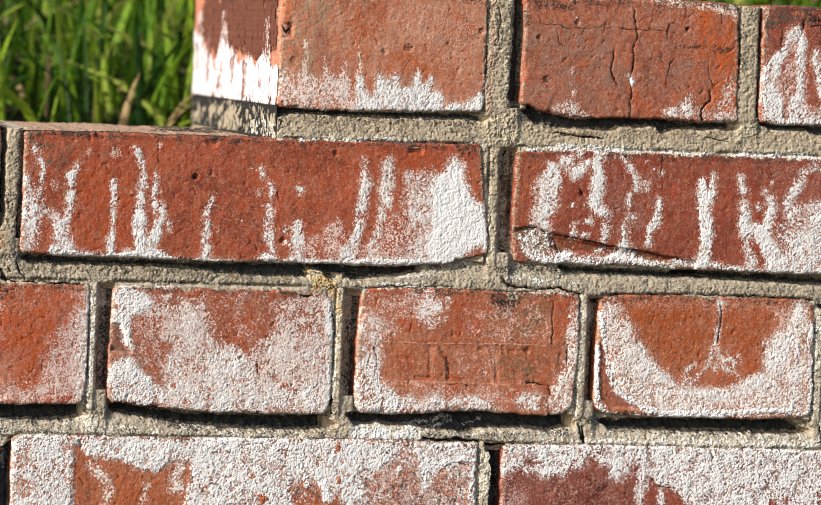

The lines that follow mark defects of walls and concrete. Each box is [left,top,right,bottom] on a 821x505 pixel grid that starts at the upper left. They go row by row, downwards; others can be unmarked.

damp [192,0,493,113]
crack [545,7,686,117]
crack [665,59,728,142]
crack [517,227,695,261]
damp [0,116,821,505]
crack [642,293,821,342]